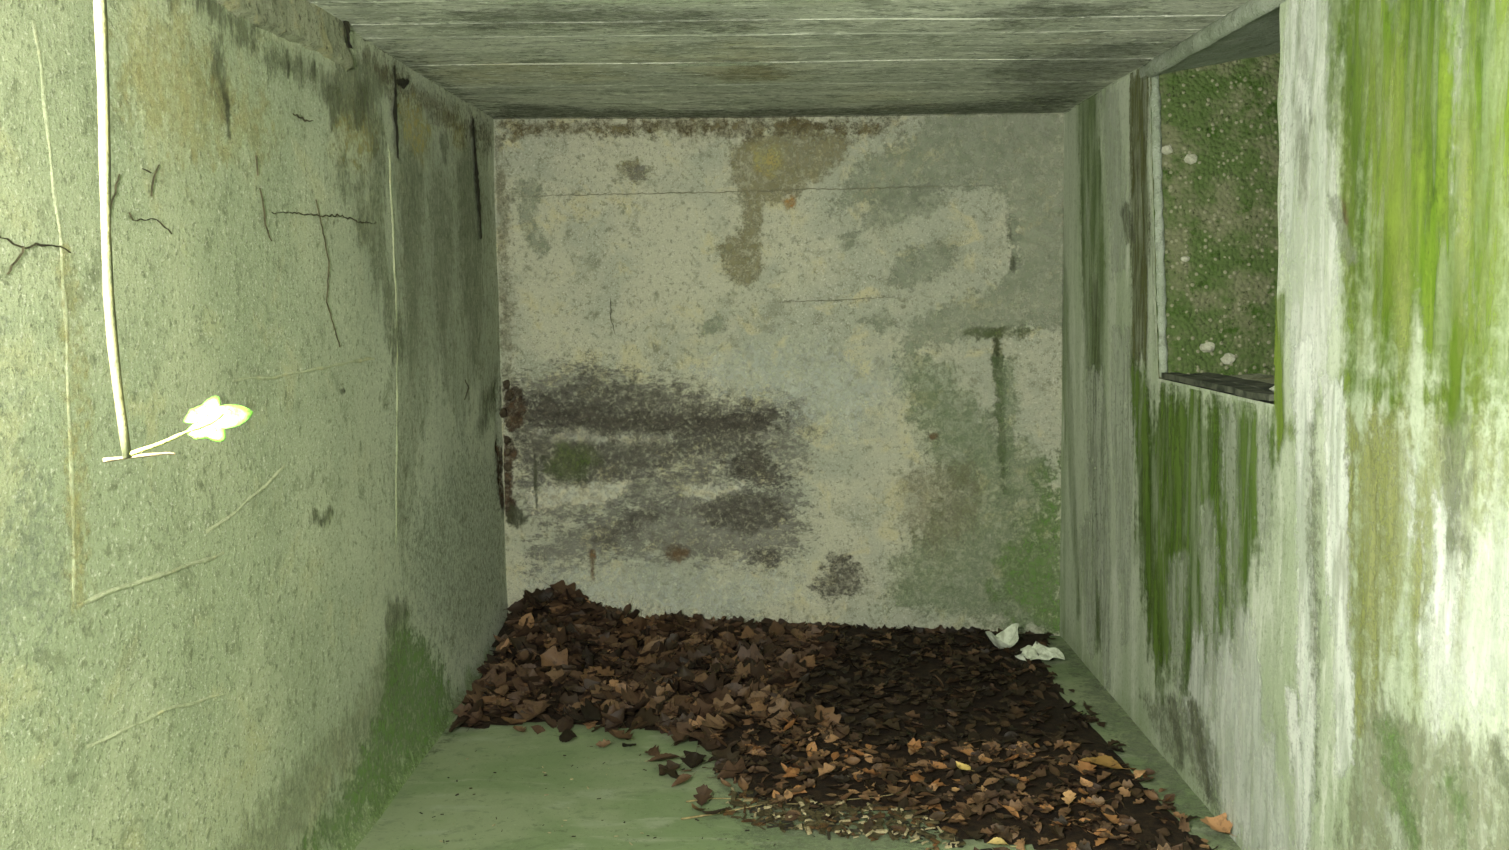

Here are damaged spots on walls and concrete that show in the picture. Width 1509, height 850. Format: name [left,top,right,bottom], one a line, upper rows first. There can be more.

crack [0,236,102,275]
crack [111,164,172,234]
crack [255,155,376,347]
damp [196,0,1067,359]
crack [472,118,992,239]
damp [447,0,1509,850]